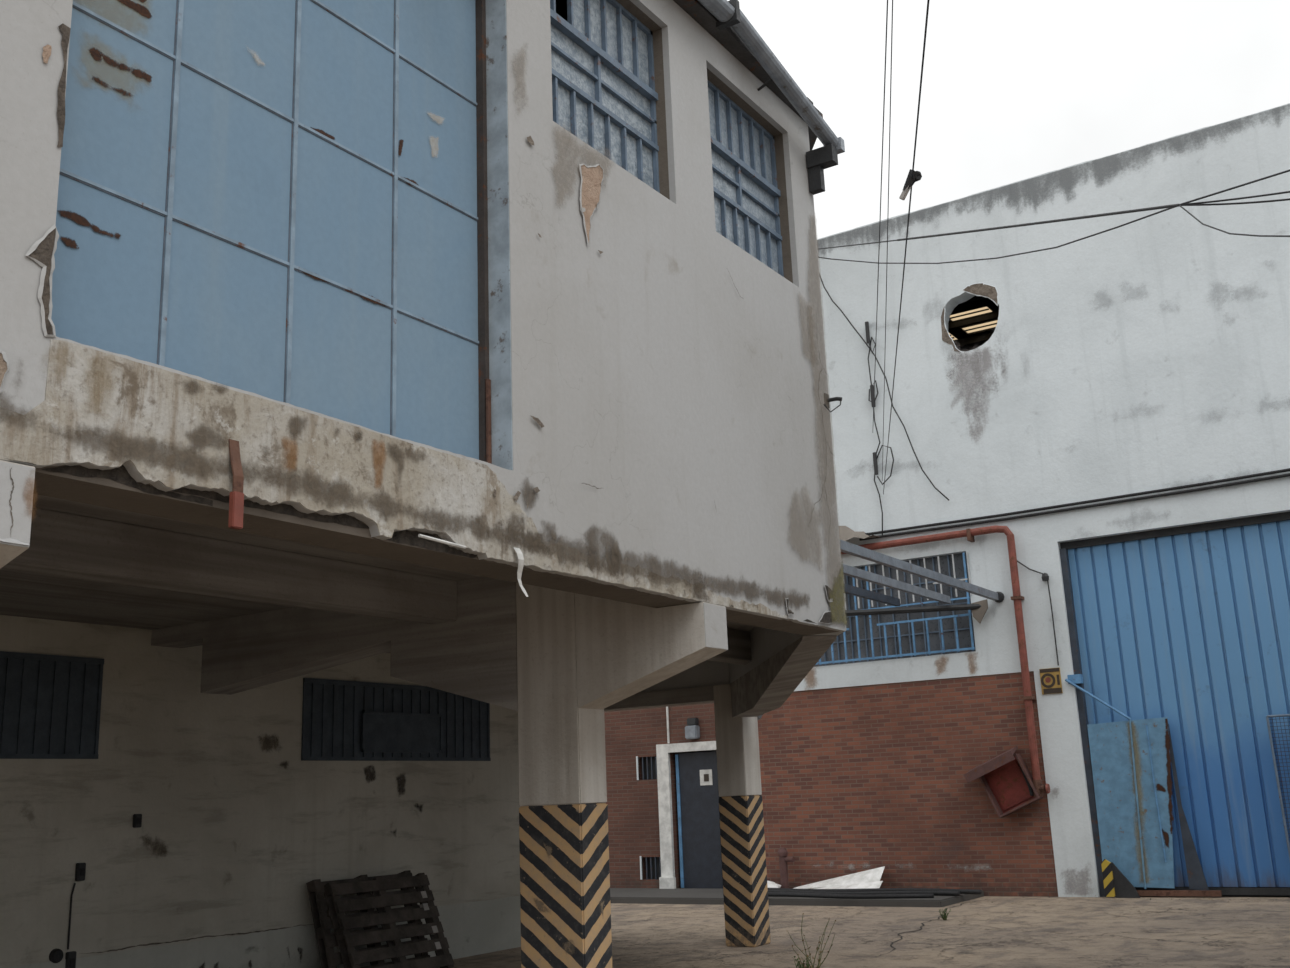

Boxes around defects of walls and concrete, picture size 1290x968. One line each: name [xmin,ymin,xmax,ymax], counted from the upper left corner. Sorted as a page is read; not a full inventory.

corrosion [118,0,152,18]
peeling [42,23,71,147]
corrosion [89,48,152,96]
corrosion [61,236,79,249]
corrosion [58,210,121,239]
peeling [579,163,604,254]
peeling [25,224,59,338]
spalling [0,349,9,394]
damp [188,425,226,448]
damp [290,416,305,436]
damp [389,445,426,472]
spalling [4,458,369,529]